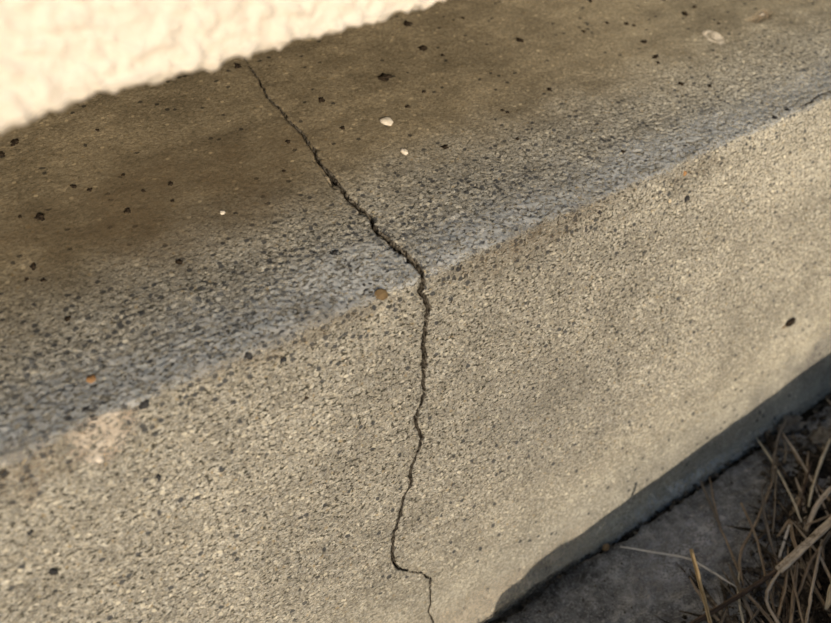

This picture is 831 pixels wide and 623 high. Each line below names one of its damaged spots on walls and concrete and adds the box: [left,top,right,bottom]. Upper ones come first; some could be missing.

crack [244,58,434,623]
crack [800,394,831,422]
crack [583,431,783,562]
crack [488,582,554,623]